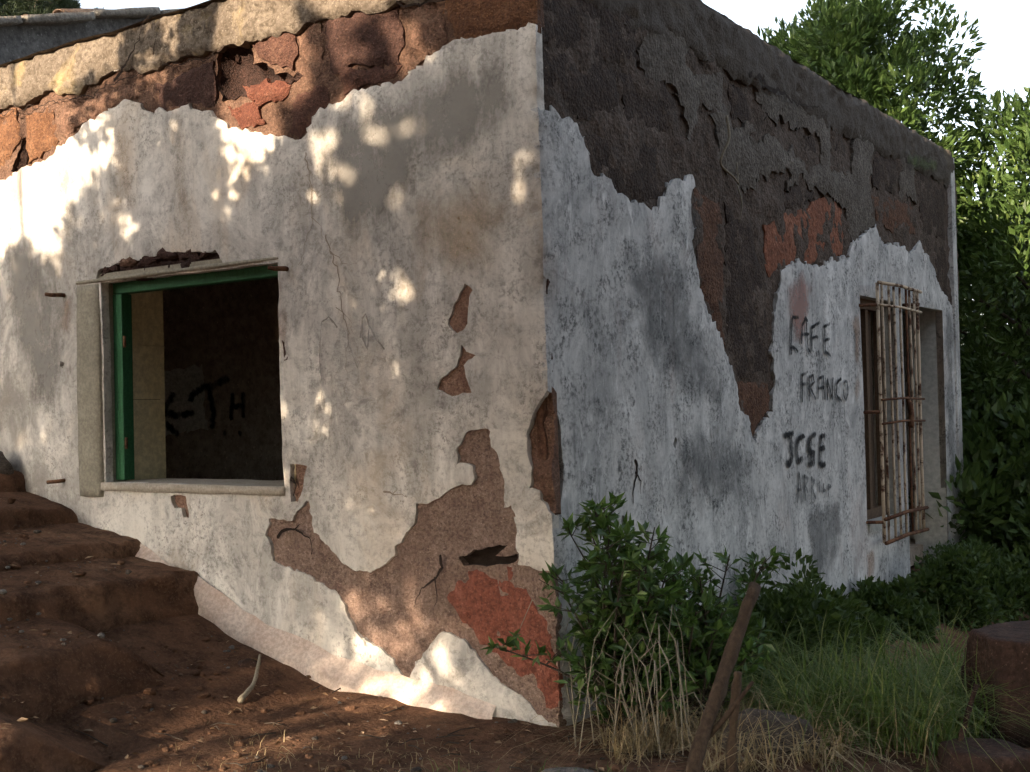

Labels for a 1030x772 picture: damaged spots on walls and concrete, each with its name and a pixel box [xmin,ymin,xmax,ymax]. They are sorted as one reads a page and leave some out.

crack [298,153,358,401]
peeling [0,0,959,437]
spalling [267,428,567,728]
spalling [529,387,561,515]